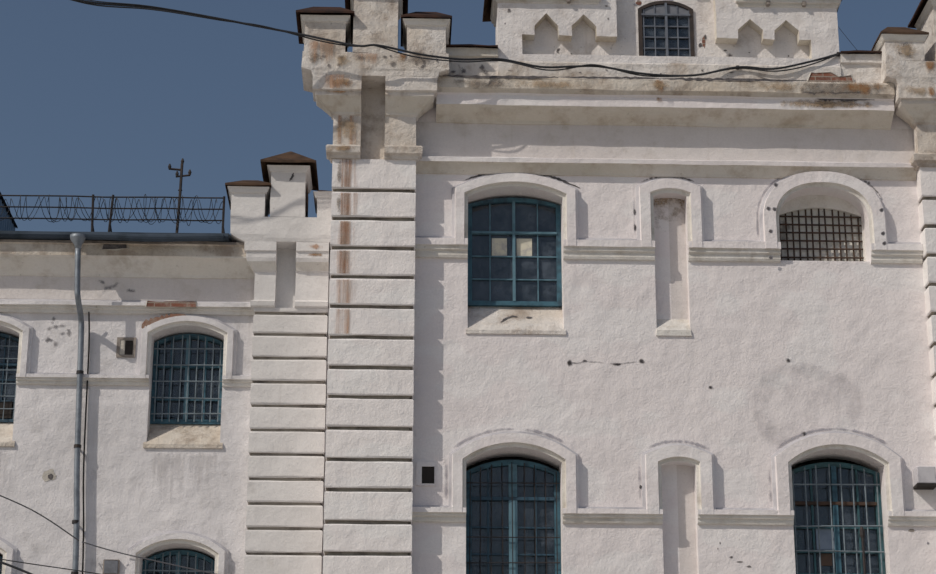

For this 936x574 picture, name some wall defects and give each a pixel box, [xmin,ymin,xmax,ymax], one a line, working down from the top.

spalling [801,71,876,108]